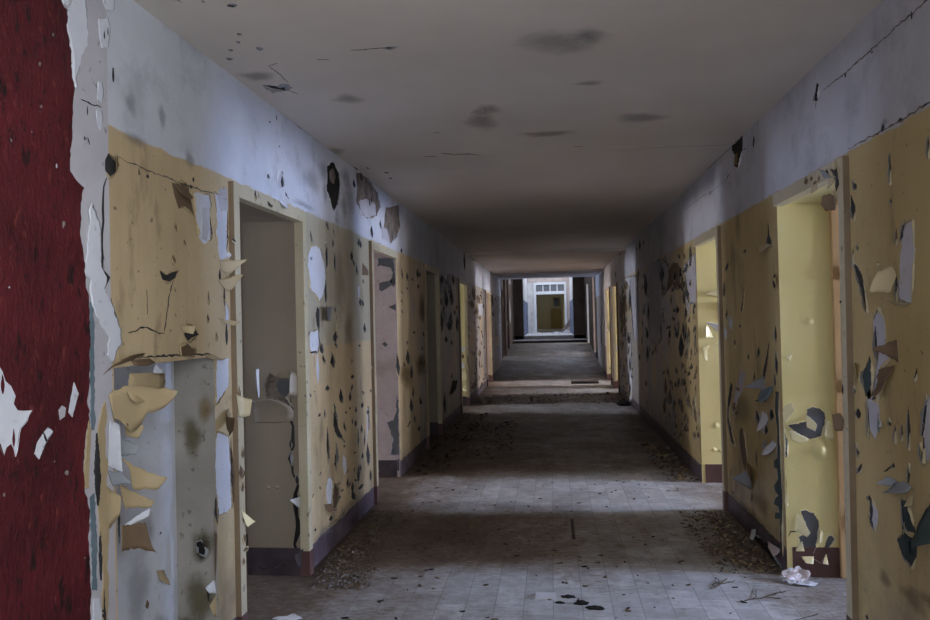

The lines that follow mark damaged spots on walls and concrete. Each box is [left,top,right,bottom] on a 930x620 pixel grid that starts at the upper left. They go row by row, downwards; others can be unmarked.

peeling [61,0,115,90]
crack [824,0,927,90]
crack [848,101,930,149]
crack [118,156,213,194]
peeling [0,368,33,457]
peeling [34,427,53,459]
peeling [58,383,79,420]
crack [128,280,174,334]
peeling [308,221,427,522]
peeling [600,245,746,441]
flaking render [727,326,844,569]
peeling [842,218,930,570]